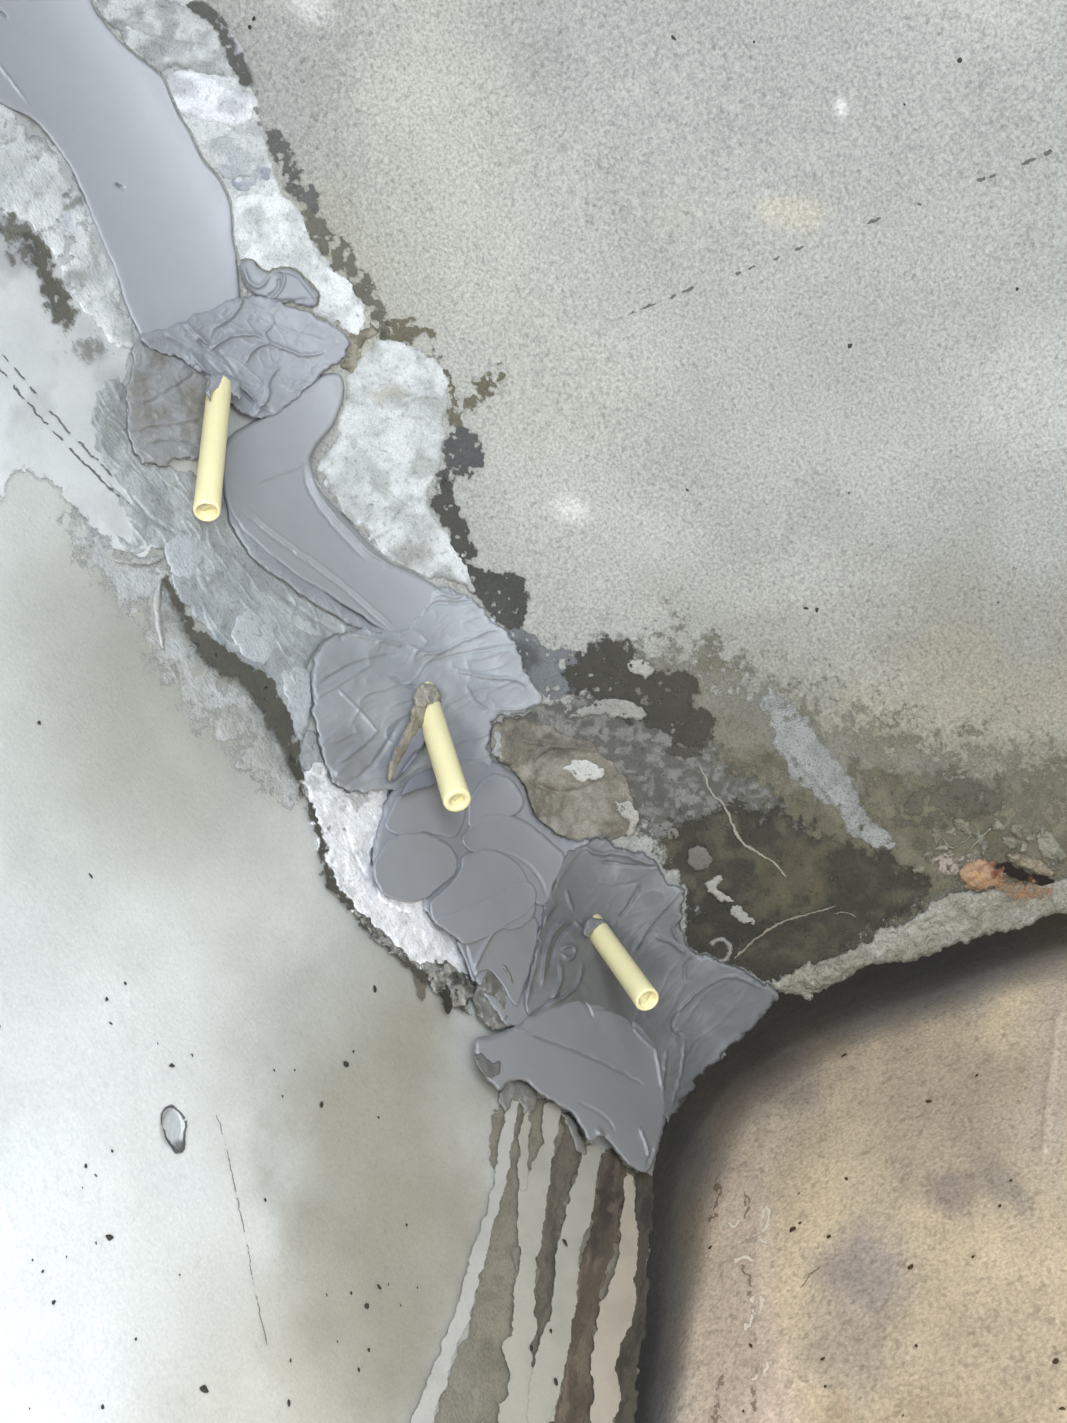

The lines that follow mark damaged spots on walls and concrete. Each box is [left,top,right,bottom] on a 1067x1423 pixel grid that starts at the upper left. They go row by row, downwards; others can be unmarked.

peeling [94,0,475,594]
leakage [0,103,153,558]
peeling [231,600,321,664]
peeling [281,667,323,771]
peeling [491,730,502,761]
peeling [563,759,605,783]
peeling [568,699,647,721]
peeling [615,801,639,837]
leakage [490,600,1067,982]
rust [931,849,1052,901]
leakage [411,1098,654,1423]